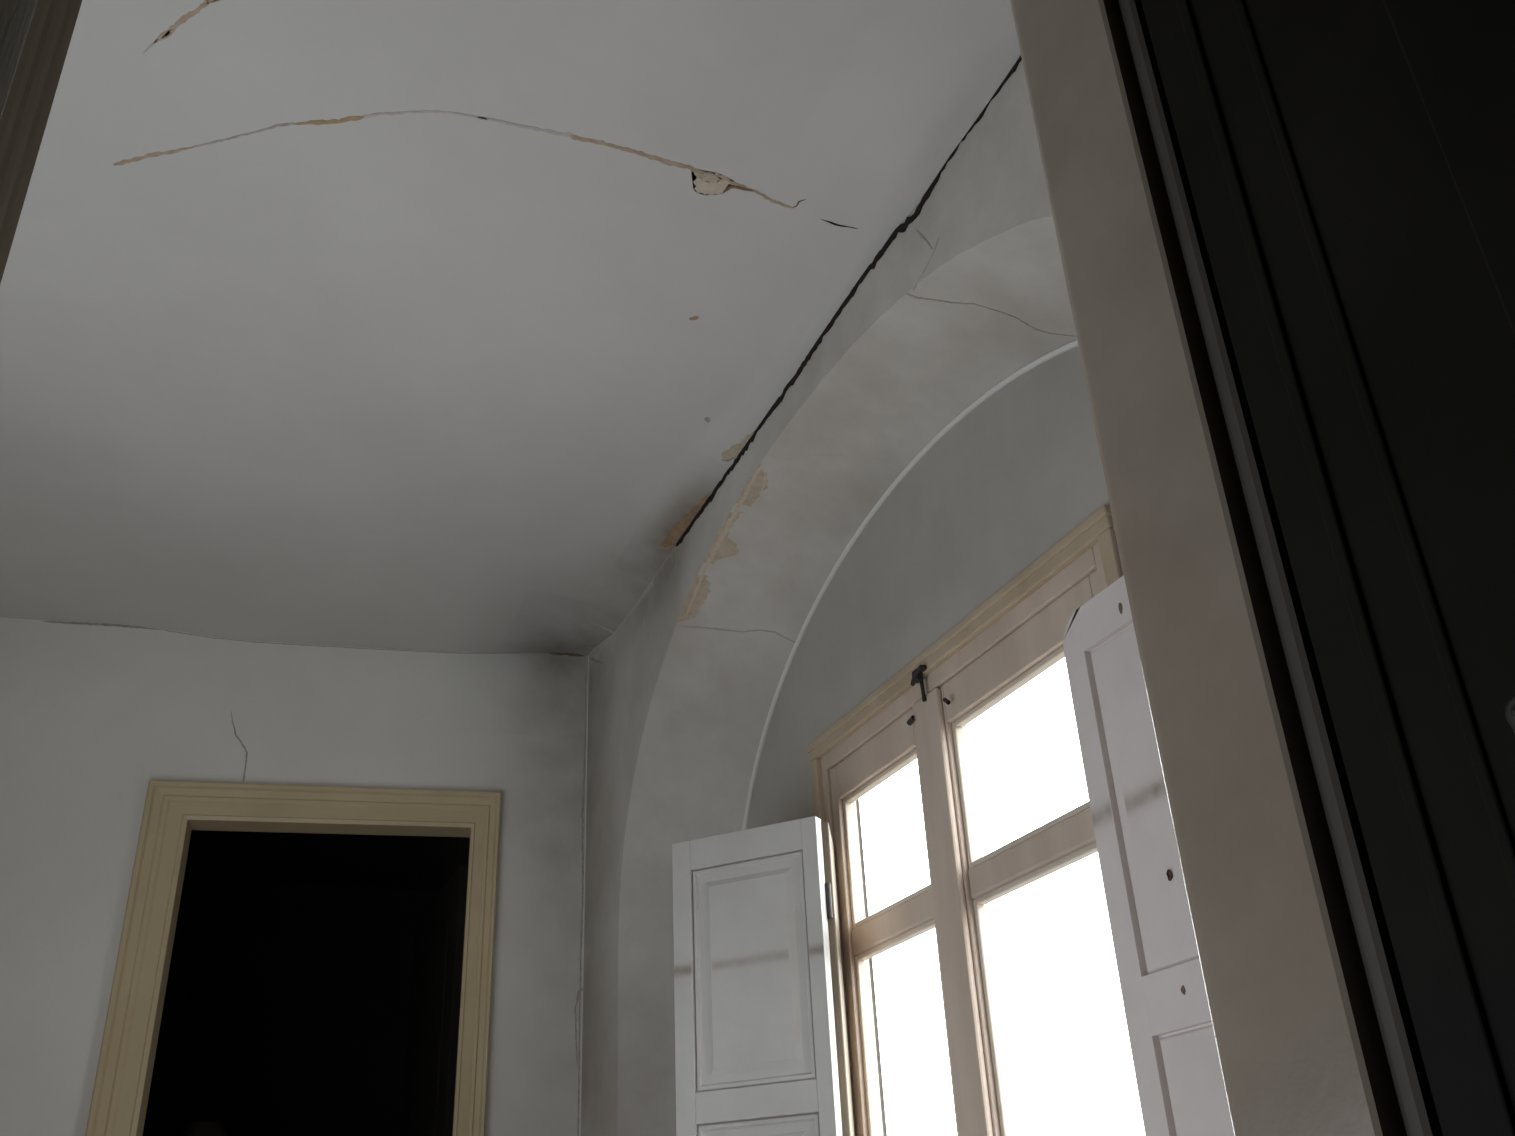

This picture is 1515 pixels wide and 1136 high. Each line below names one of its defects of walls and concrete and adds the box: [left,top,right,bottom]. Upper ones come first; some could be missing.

crack [143,0,219,54]
flaking render [691,170,735,195]
crack [113,55,1077,579]
flaking render [677,463,768,623]